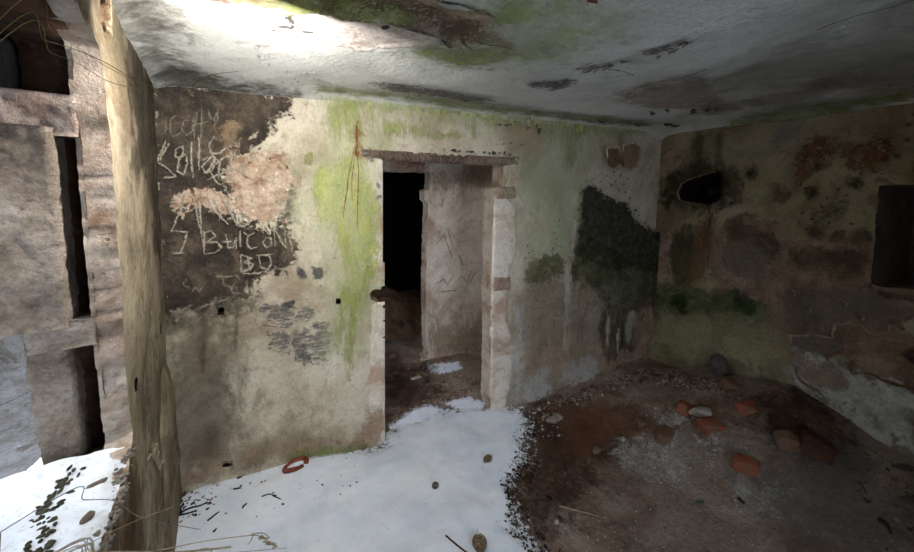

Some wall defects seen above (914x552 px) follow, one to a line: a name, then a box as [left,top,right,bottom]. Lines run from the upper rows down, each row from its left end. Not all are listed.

spalling [269,0,502,52]
flaking render [170,120,302,225]
rust [343,119,359,226]
flaking render [606,140,643,170]
damp [335,267,373,376]
damp [513,168,660,403]
damp [671,167,914,394]
damp [171,315,384,483]